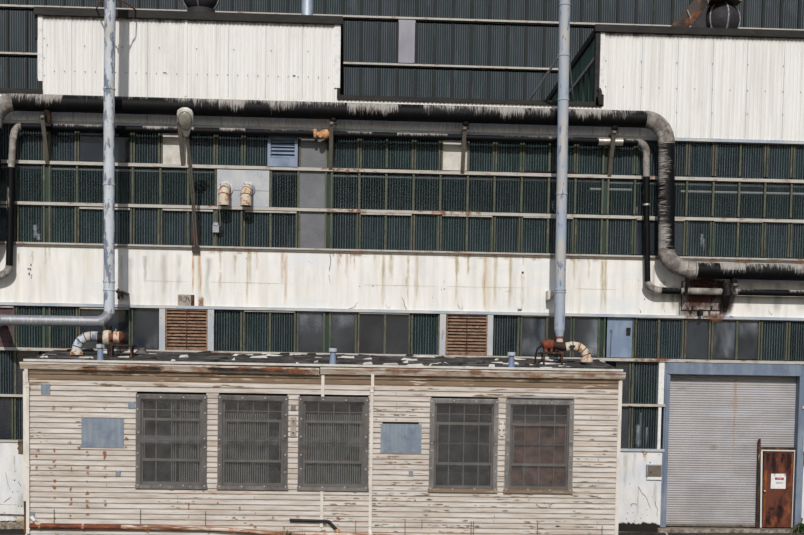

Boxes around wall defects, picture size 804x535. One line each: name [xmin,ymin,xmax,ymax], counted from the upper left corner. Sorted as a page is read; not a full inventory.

corrosion [681,279,734,321]
corrosion [765,453,793,486]
spalling [0,512,24,529]
peeling [372,473,480,533]